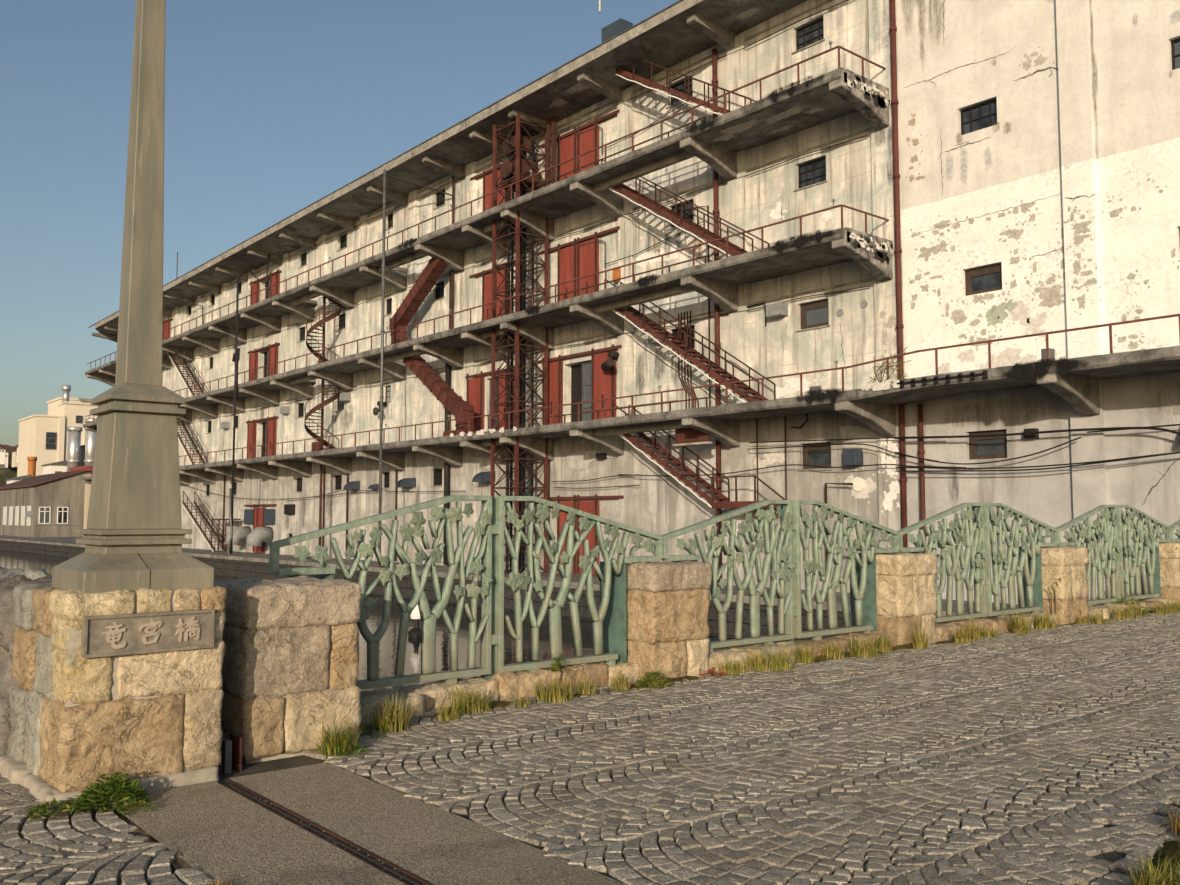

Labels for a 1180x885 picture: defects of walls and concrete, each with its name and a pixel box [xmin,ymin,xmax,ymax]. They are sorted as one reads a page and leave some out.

crack [909,1,1058,87]
spalling [847,75,890,108]
spalling [849,232,893,265]
peeling [909,196,1145,374]
peeling [839,436,900,514]
crack [1142,458,1179,505]